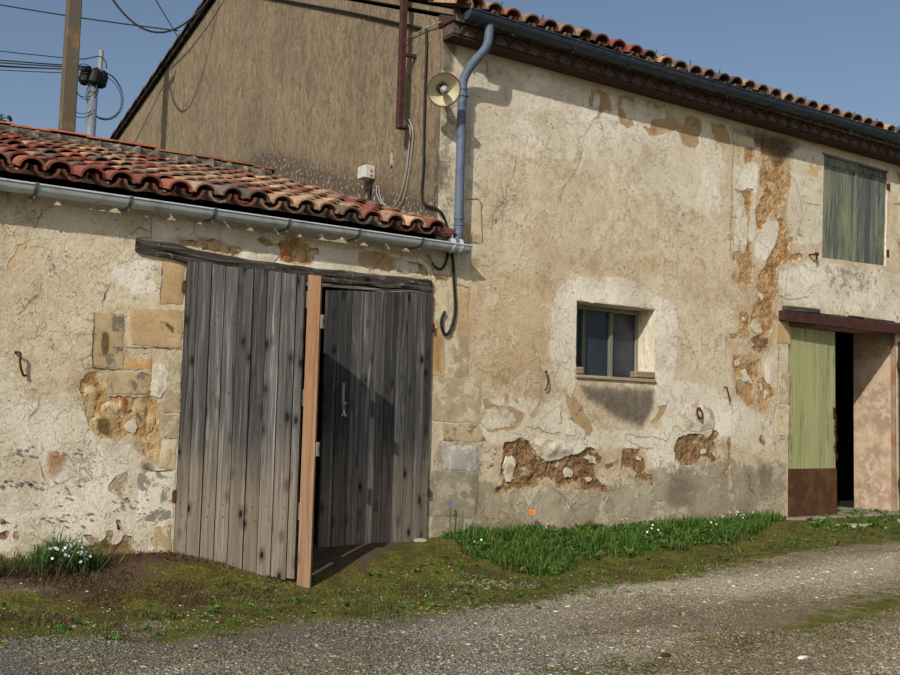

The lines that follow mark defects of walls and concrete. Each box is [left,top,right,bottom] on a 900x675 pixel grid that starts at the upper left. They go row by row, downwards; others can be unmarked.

flaking render [588,85,821,413]
flaking render [79,369,160,463]
flaking render [481,389,655,496]
damp [585,389,652,424]
flaking render [674,430,731,476]